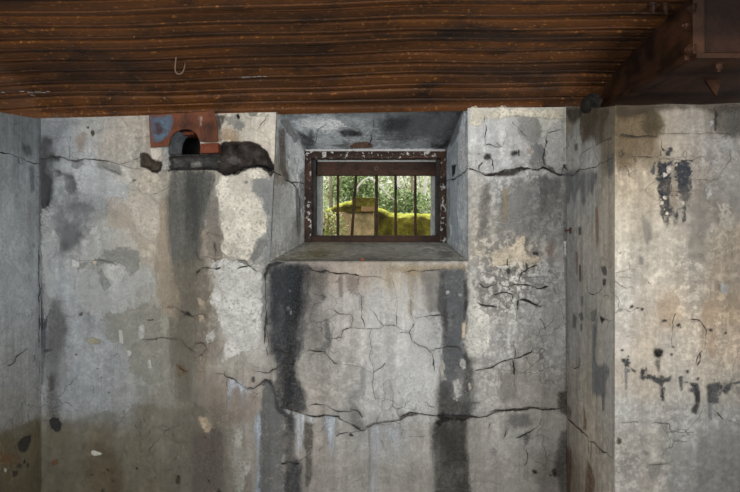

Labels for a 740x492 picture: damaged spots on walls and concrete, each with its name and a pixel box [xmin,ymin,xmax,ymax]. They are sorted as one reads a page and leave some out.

crack [0,136,142,176]
flaking render [140,140,274,176]
crack [446,118,725,182]
damp [166,169,215,399]
damp [270,264,326,492]
crack [142,260,612,466]
damp [431,269,475,492]
damp [621,349,740,419]